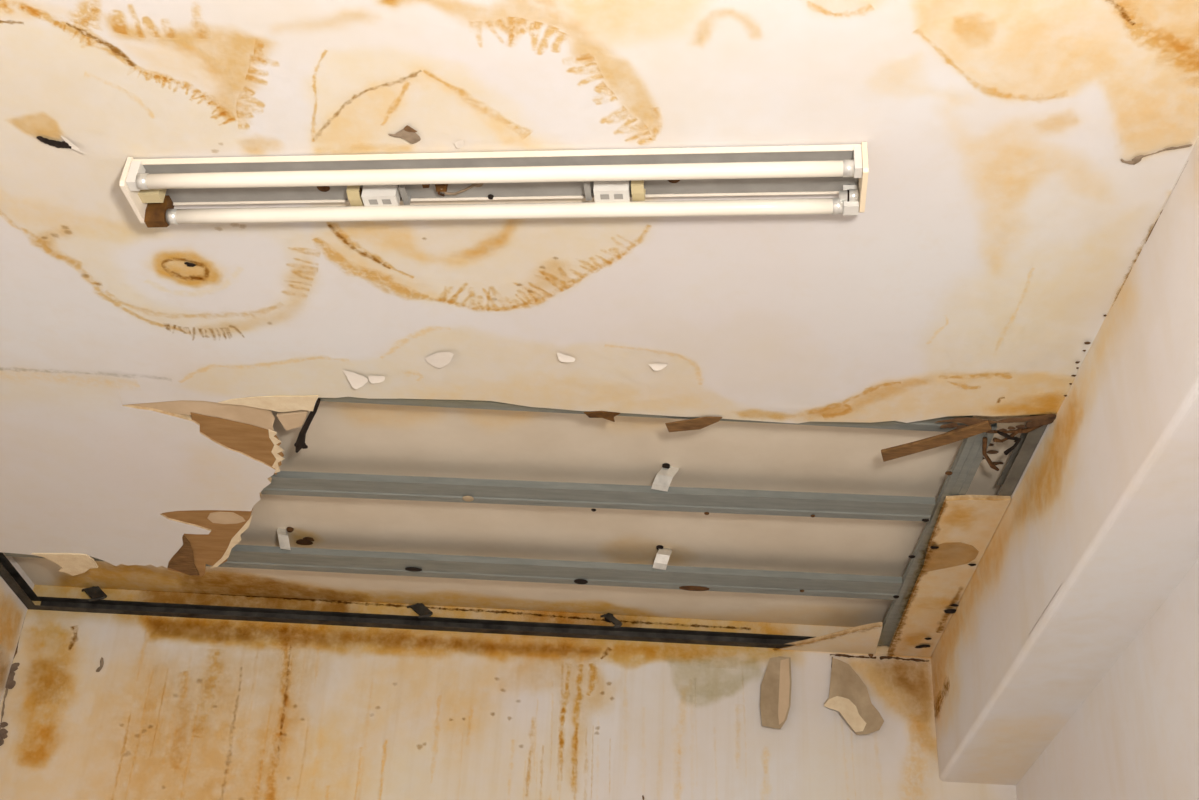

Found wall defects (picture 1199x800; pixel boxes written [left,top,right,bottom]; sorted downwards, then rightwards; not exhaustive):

peeling [36,136,86,154]
peeling [557,353,575,362]
peeling [342,370,385,389]
leakage [935,414,1056,465]